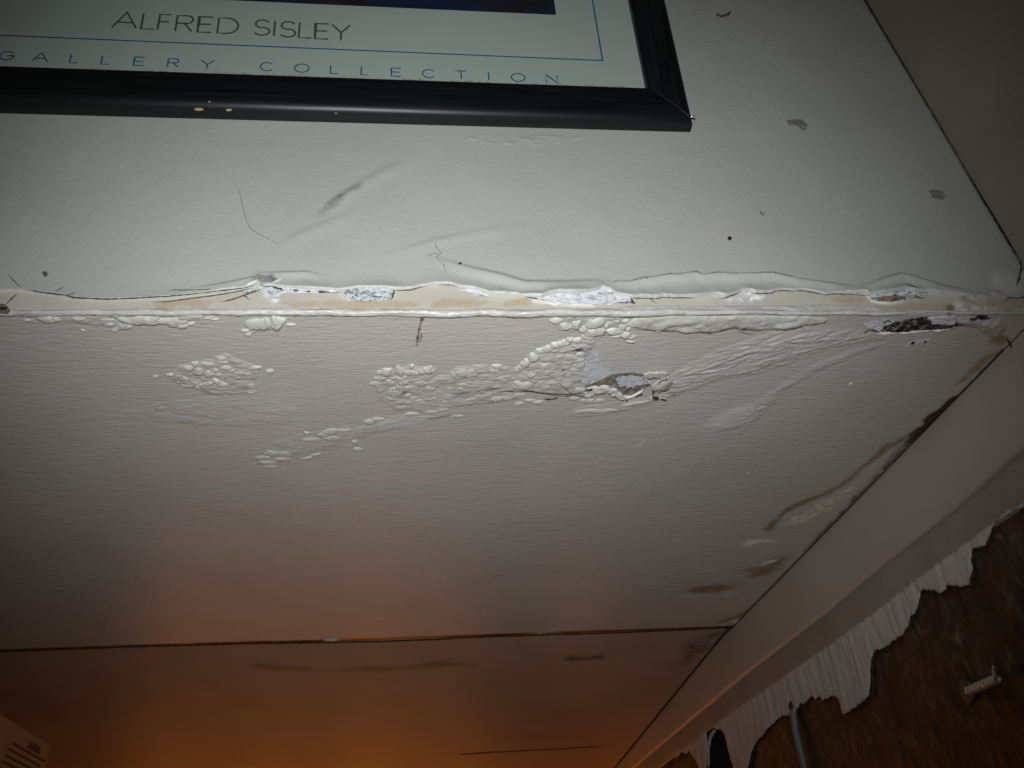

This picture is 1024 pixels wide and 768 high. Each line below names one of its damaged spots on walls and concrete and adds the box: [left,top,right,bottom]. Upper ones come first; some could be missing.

crack [392,242,456,298]
crack [5,276,335,305]
peeling [243,286,394,303]
peeling [462,288,489,296]
peeling [526,287,636,307]
crack [615,271,714,302]
crack [720,272,868,299]
peeling [867,283,927,304]
peeling [864,315,991,346]
leakage [743,390,965,552]